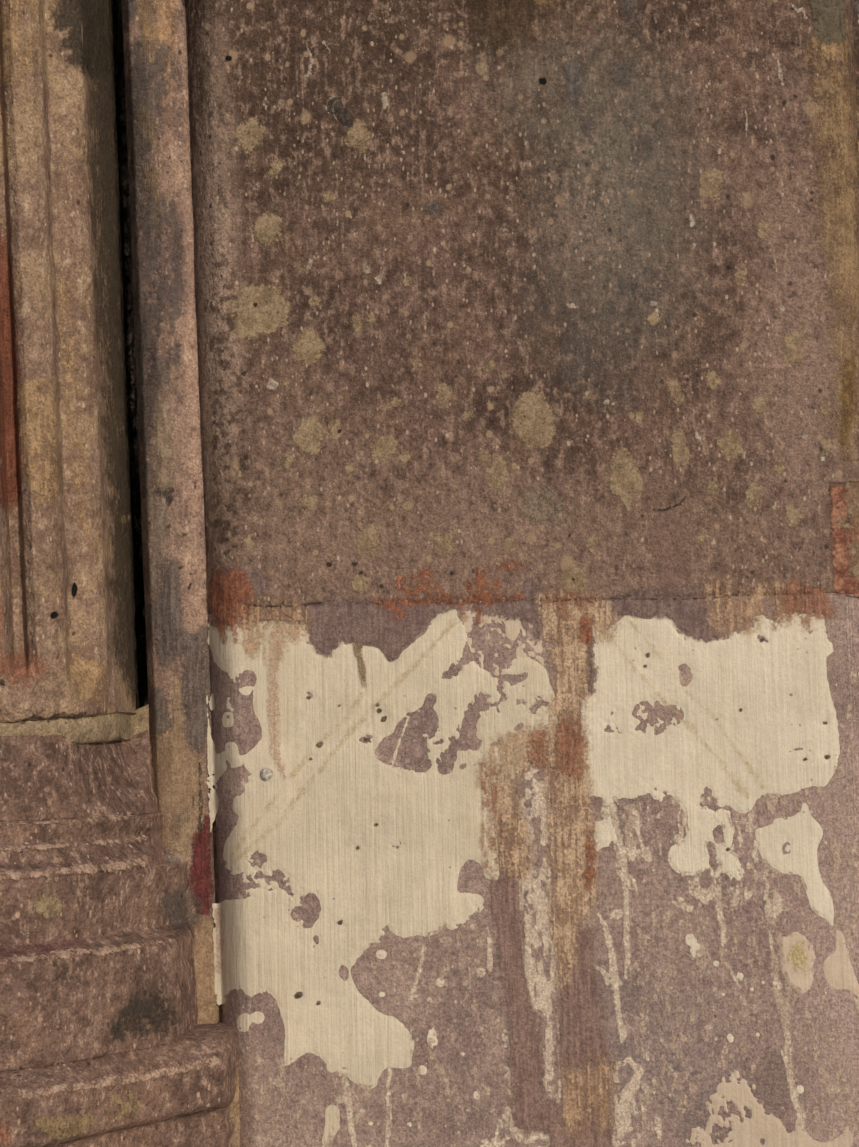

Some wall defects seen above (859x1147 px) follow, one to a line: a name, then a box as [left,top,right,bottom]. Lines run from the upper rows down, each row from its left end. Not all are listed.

corrosion [208,568,311,772]
corrosion [704,579,835,632]
peeling [206,597,562,1103]
corrosion [375,562,617,988]
peeling [580,613,859,997]
corrosion [561,1054,616,1138]
peeling [685,1070,854,1147]